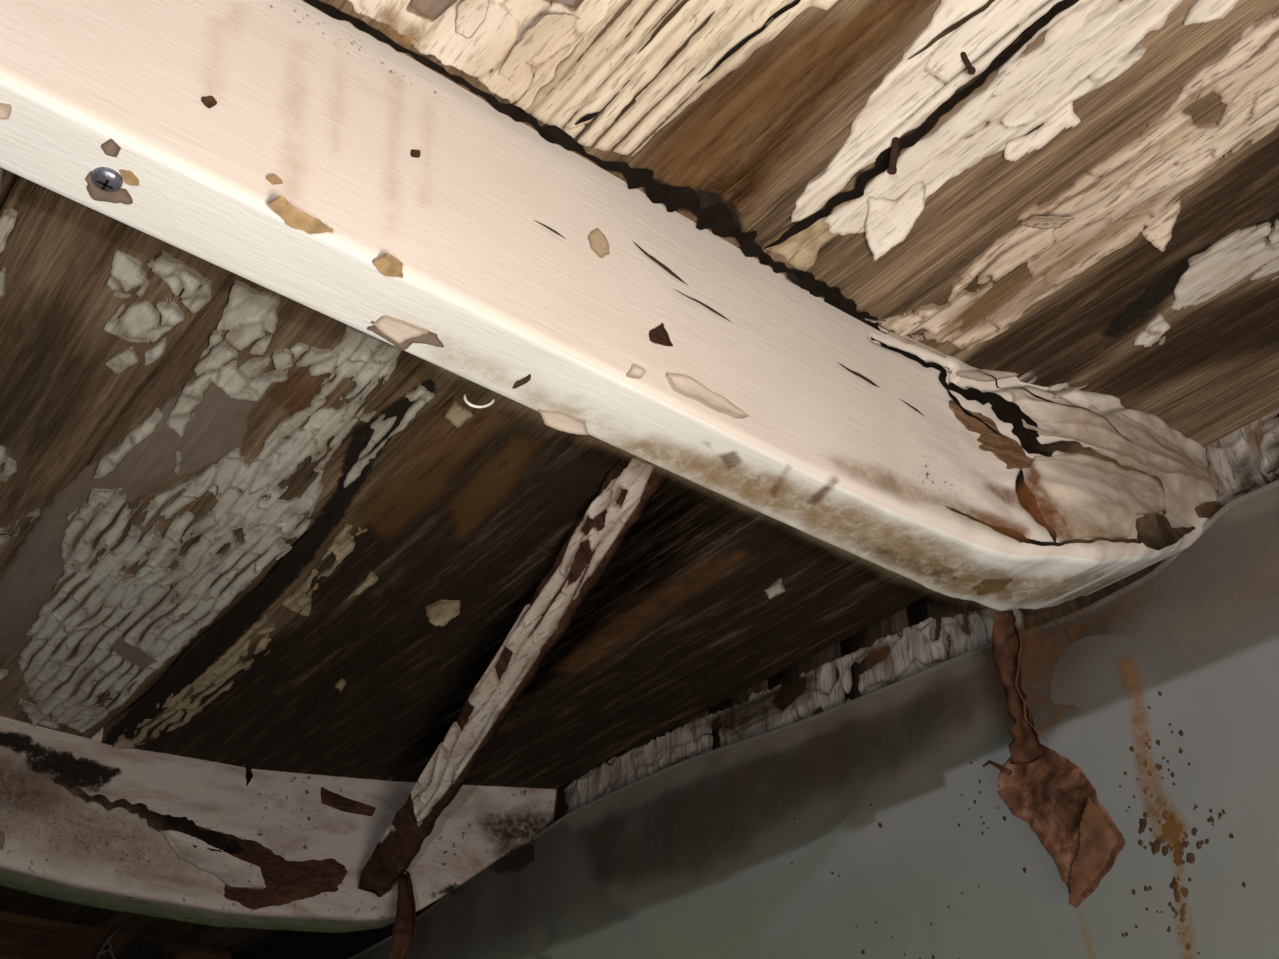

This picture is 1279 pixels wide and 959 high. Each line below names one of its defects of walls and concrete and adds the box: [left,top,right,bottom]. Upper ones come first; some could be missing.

spalling [85,138,139,205]
peeling [104,250,212,374]
spalling [266,174,333,234]
peeling [348,0,838,156]
spalling [649,323,673,346]
crack [302,0,1166,546]
peeling [763,0,1240,271]
peeling [865,10,1279,542]
peeling [538,409,588,435]
peeling [0,280,444,749]
damp [0,732,195,883]
peeling [564,578,1126,908]